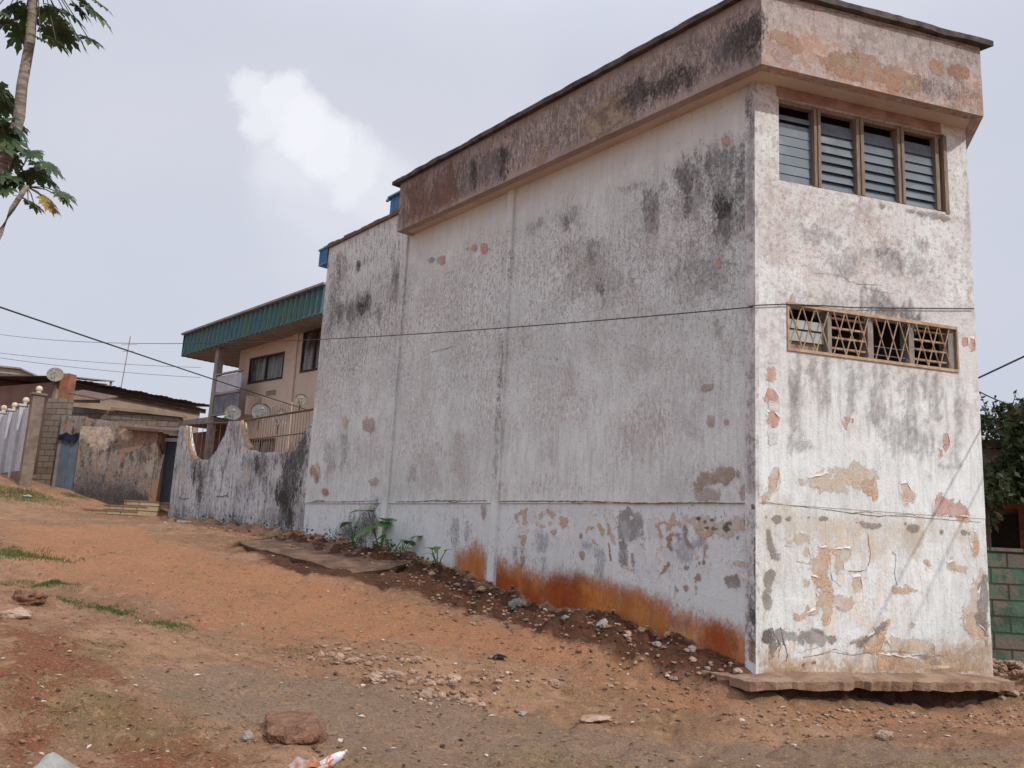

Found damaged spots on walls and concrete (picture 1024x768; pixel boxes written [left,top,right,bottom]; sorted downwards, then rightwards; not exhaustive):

water stain [593,10,768,137]
peeling [815,46,970,98]
water stain [670,101,753,245]
peeling [762,358,780,446]
water stain [73,442,149,505]
water stain [242,426,310,530]
peeling [514,508,568,547]
rust [456,546,745,664]
peeling [579,466,864,663]
peeling [796,461,880,502]
crack [749,626,948,662]
peeling [931,493,990,646]